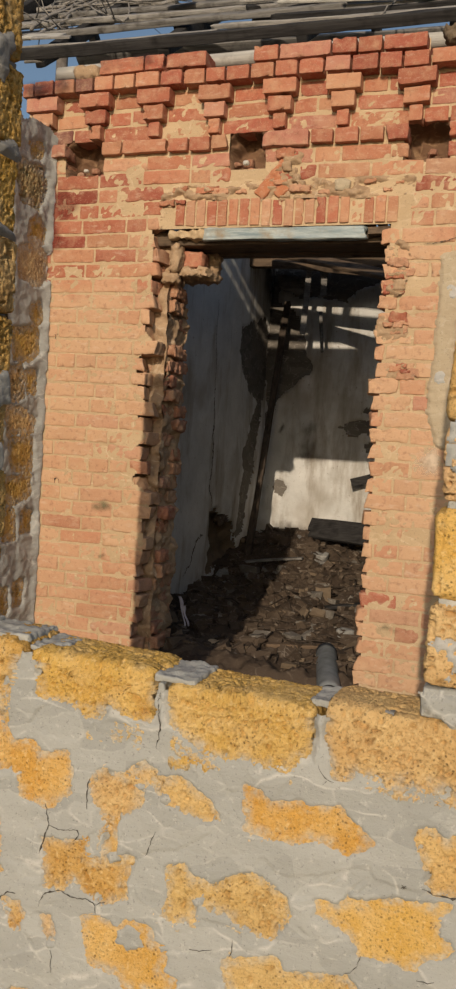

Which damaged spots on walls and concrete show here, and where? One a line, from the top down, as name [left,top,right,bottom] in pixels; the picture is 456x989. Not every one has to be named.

spalling [159,132,416,229]
flaking render [205,239,419,575]
crack [39,804,79,851]